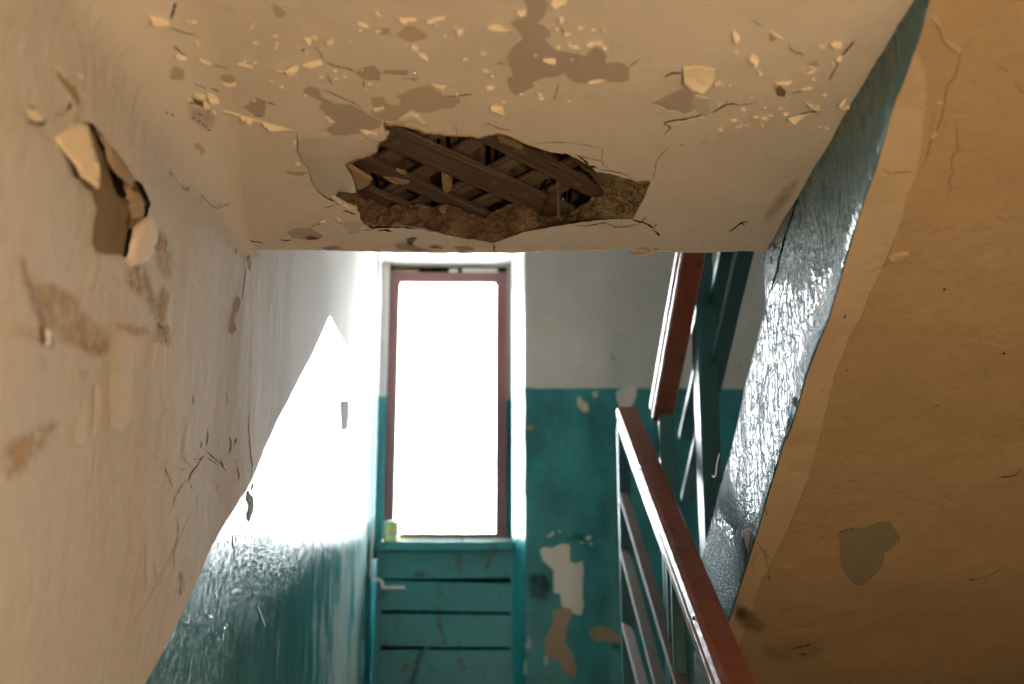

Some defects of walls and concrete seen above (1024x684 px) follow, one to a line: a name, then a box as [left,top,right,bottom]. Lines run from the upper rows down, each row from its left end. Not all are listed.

flaking render [26,68,167,267]
flaking render [149,0,650,253]
crack [767,41,974,581]
crack [132,412,253,626]
peeling [540,531,592,678]
flaking render [589,626,621,644]
peeling [837,521,901,586]